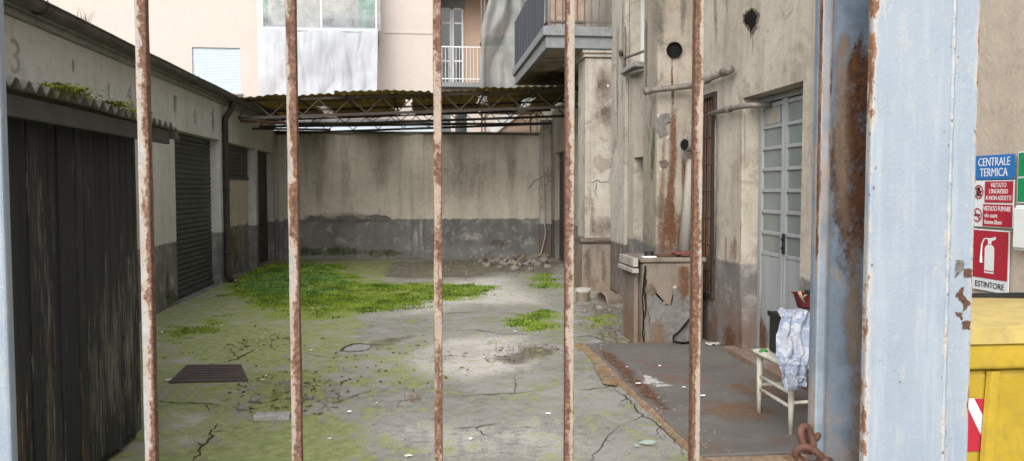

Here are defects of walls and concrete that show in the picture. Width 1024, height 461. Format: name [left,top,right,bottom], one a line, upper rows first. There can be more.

spalling [743,8,760,39]
rust [657,58,685,253]
rust [830,35,868,461]
flaking render [646,284,690,342]
peeling [955,260,972,330]
crack [160,400,223,461]
crack [579,385,685,460]